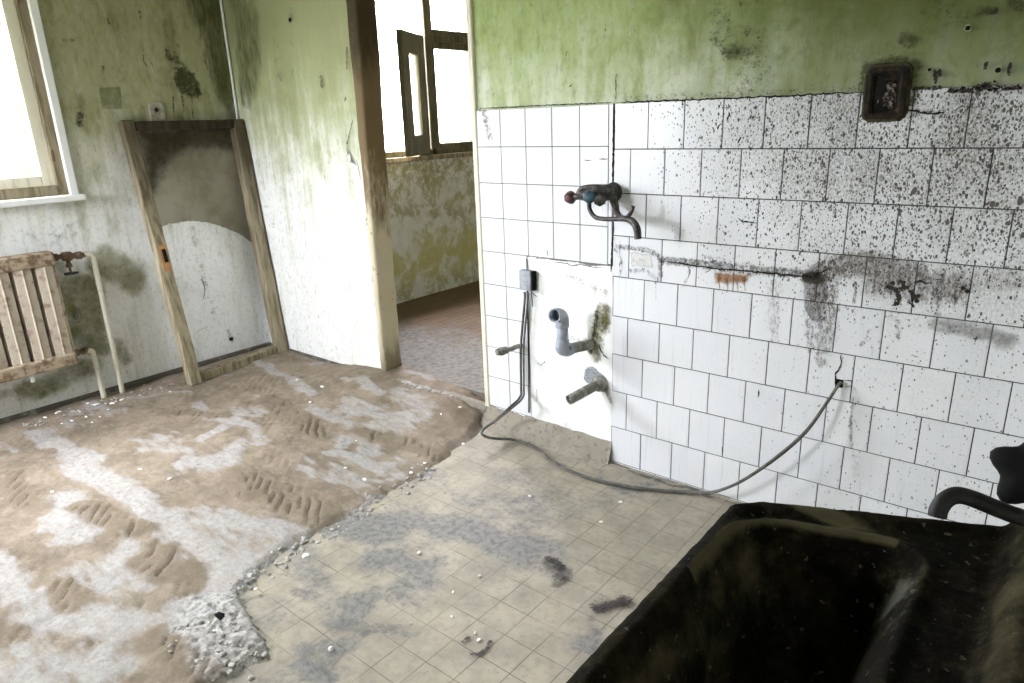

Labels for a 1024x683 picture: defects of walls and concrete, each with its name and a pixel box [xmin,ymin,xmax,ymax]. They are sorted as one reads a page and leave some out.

damp [171,56,202,117]
damp [192,0,258,105]
damp [15,249,142,398]
spalling [527,252,613,441]
corrosion [715,273,748,287]
crack [661,257,830,280]
damp [806,250,1021,365]